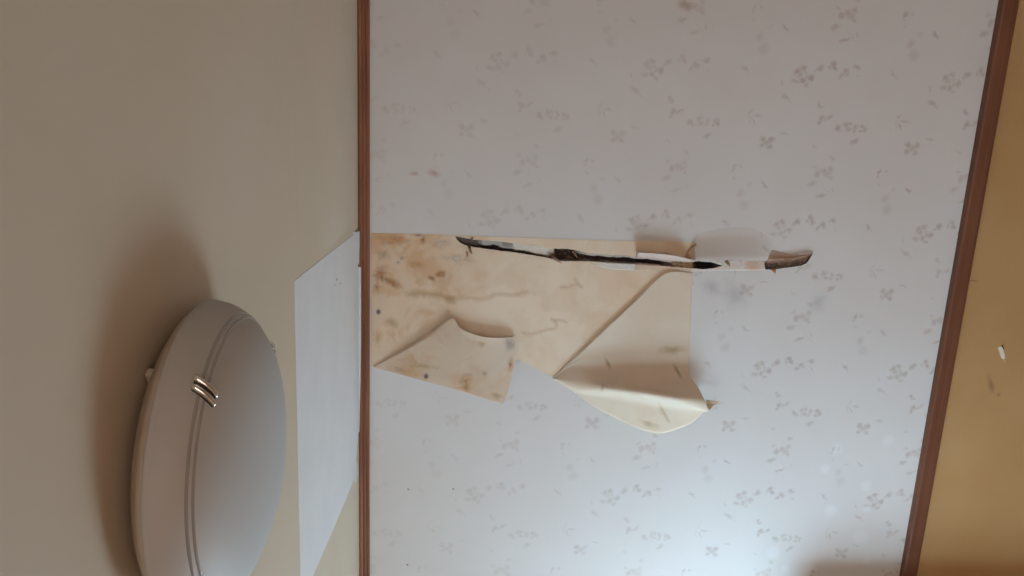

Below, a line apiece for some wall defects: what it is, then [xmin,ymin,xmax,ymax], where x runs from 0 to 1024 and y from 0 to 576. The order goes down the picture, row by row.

crack [455,227,814,273]